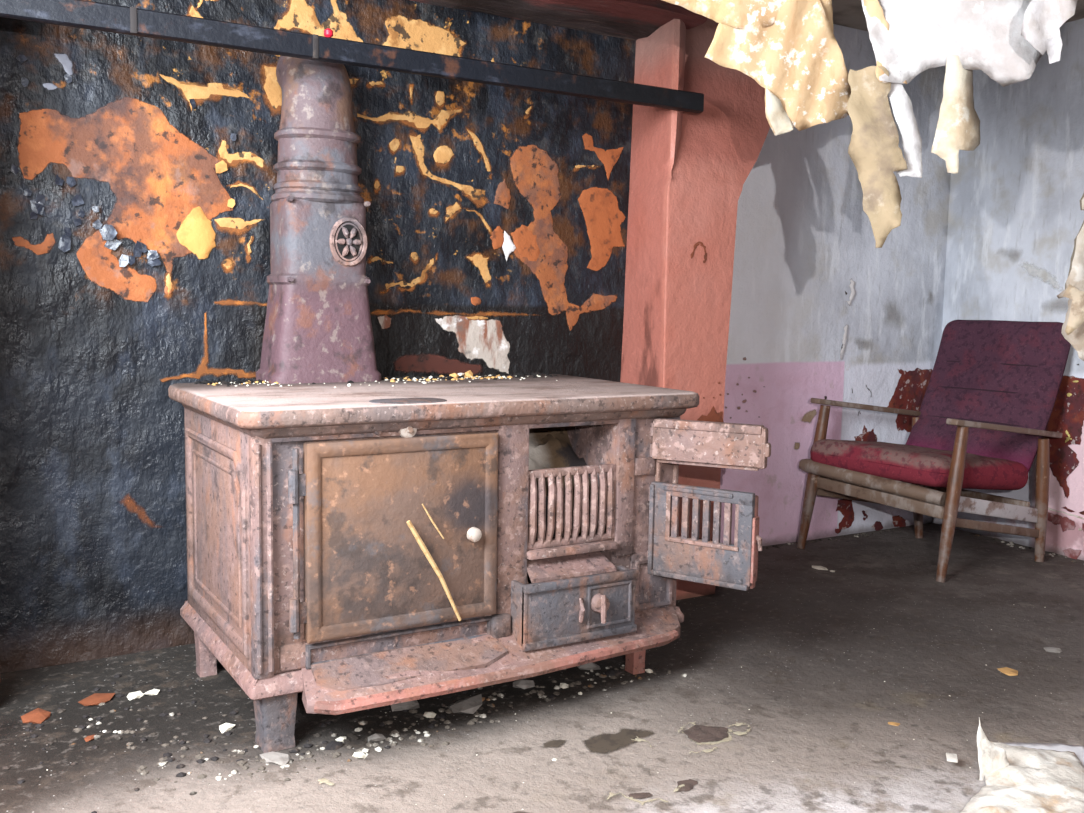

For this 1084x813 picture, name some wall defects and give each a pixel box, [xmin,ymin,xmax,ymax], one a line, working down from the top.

peeling [274,0,363,42]
peeling [383,15,466,57]
peeling [349,78,386,89]
peeling [11,97,268,302]
peeling [357,84,617,331]
peeling [573,133,625,271]
spalling [394,297,510,384]
peeling [888,368,933,432]
peeling [854,425,877,442]
peeling [1043,376,1084,532]
peeling [835,499,906,534]
peeling [1063,548,1082,559]